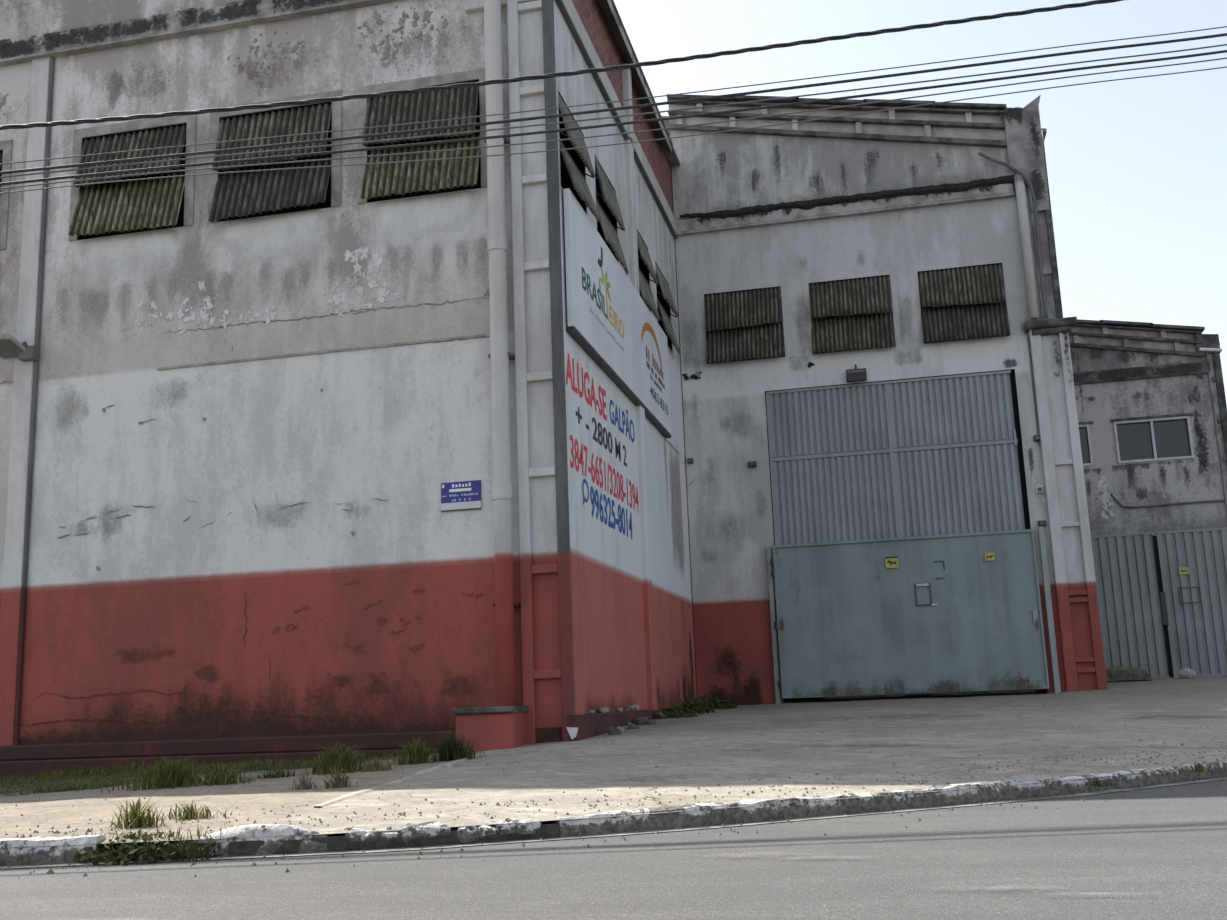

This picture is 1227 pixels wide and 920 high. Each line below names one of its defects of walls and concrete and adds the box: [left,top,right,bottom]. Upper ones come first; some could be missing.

damp [0,0,341,59]
peeling [322,240,400,316]
peeling [124,281,277,336]
damp [710,651,763,706]
damp [18,700,455,745]